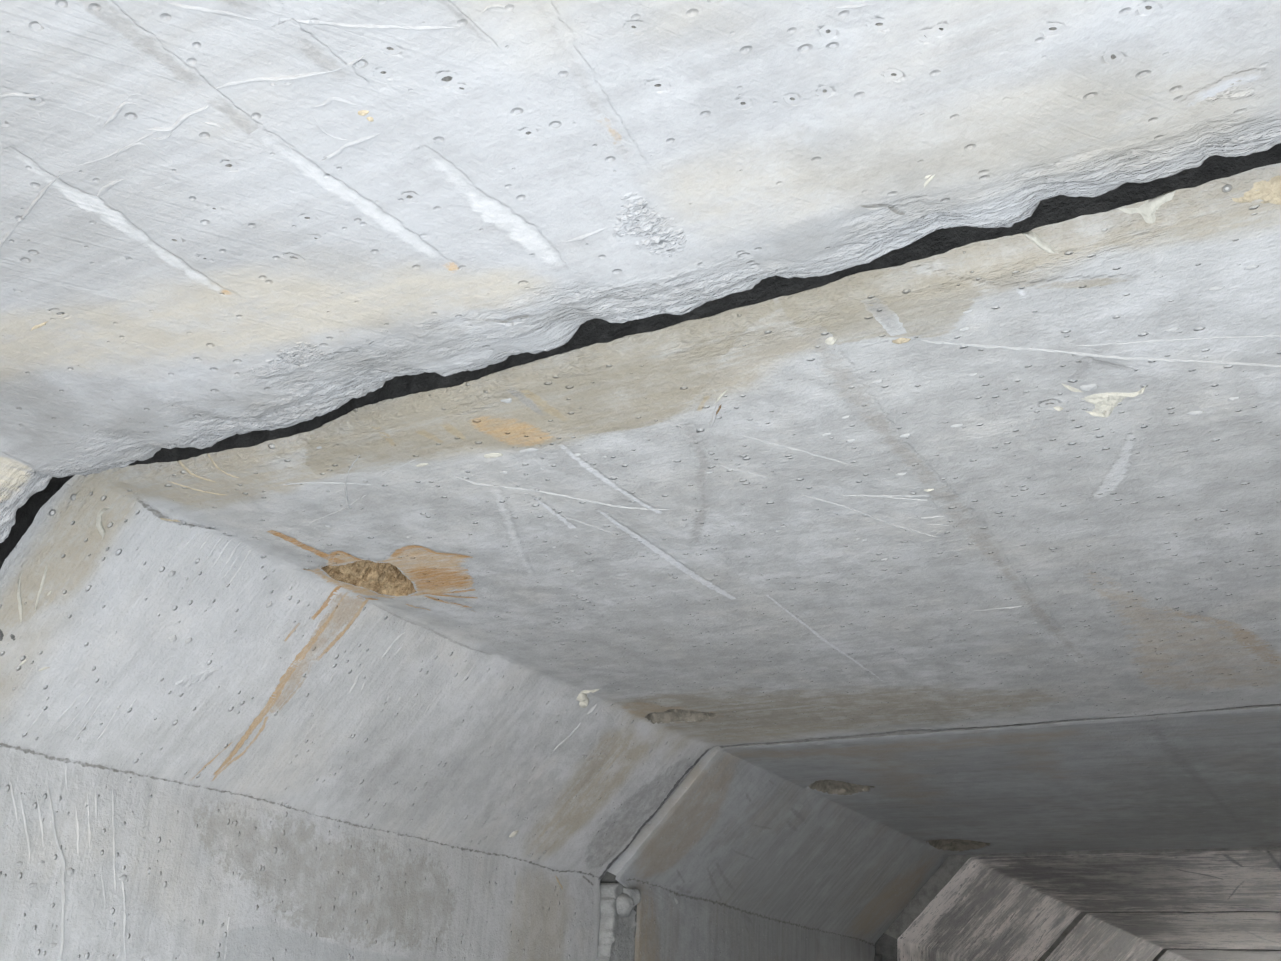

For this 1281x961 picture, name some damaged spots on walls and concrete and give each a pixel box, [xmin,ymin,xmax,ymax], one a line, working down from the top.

crack [860,205,906,215]
crack [482,315,541,327]
crack [921,336,1281,368]
crack [739,434,847,464]
crack [124,496,217,531]
crack [453,475,669,534]
crack [804,489,951,537]
spalling [267,530,480,620]
peeling [0,563,52,641]
rust [188,590,371,783]
spalling [619,702,727,726]
crack [0,742,875,961]